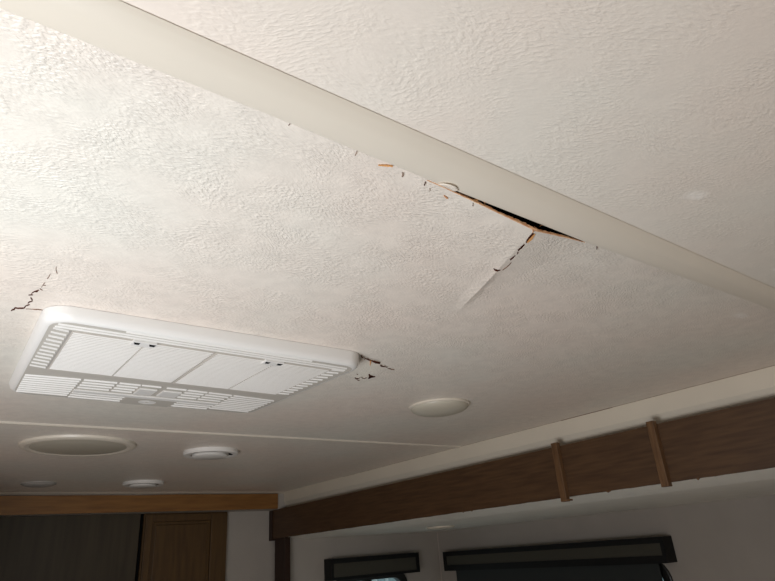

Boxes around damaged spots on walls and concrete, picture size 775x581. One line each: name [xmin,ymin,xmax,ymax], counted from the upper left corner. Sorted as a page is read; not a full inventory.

crack [493,232,535,272]
crack [11,271,57,311]
crack [355,355,394,381]